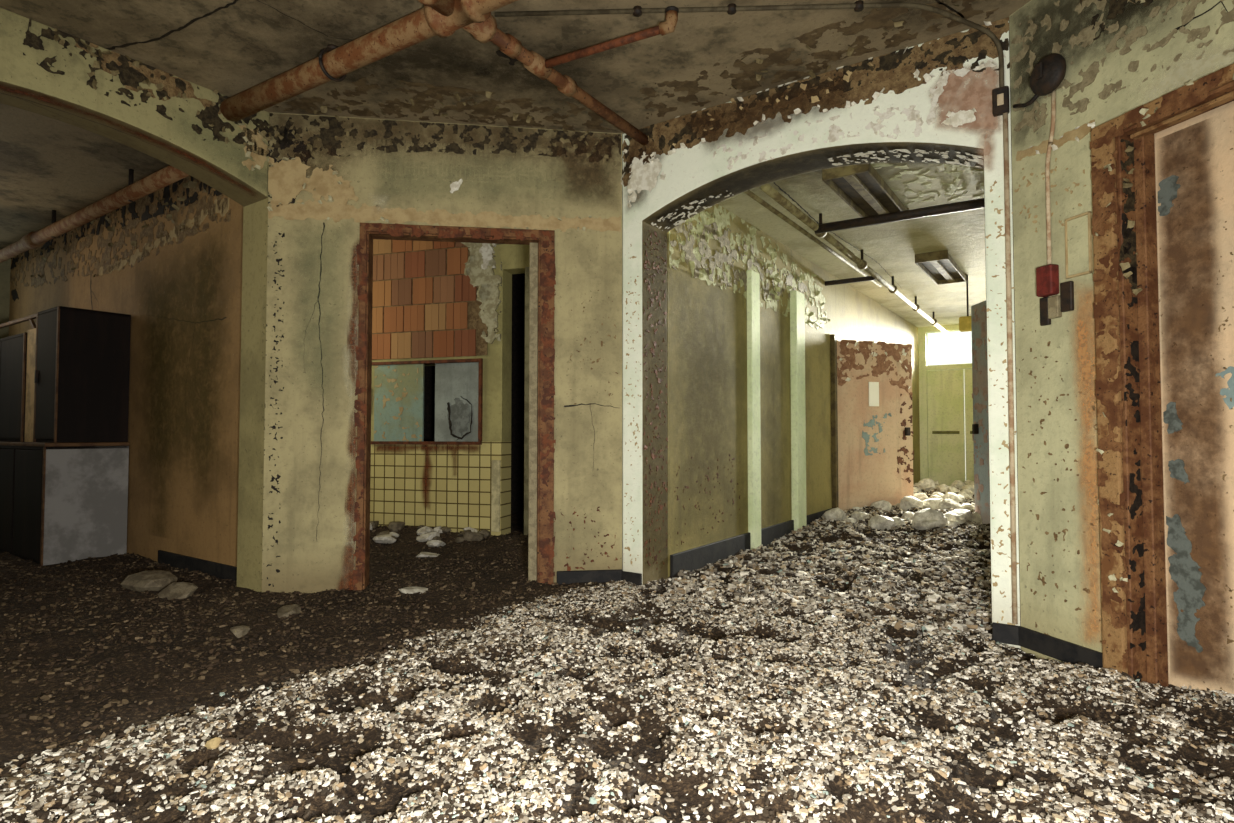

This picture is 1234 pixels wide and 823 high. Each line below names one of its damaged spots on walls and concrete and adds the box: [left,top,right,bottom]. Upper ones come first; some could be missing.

crack [105,0,349,50]
peeling [10,176,231,302]
rust [339,242,478,591]
rust [365,223,556,585]
peeling [238,0,1234,625]
rust [1077,68,1234,682]